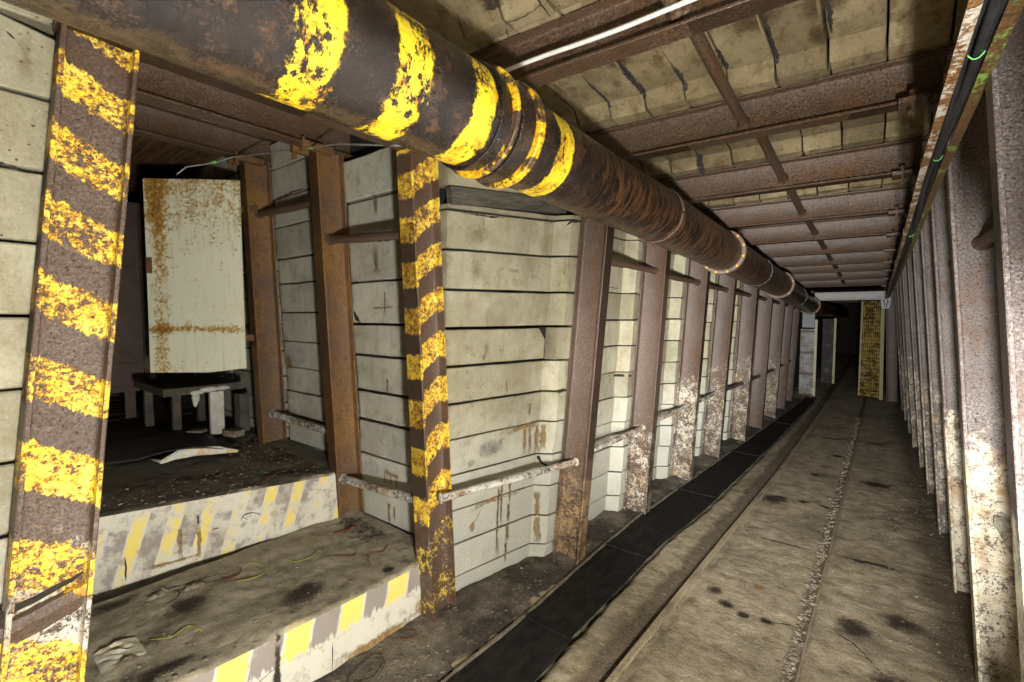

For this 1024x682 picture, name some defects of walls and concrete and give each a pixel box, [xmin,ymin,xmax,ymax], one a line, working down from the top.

rust [511,404,546,449]
rust [477,483,541,560]
water stain [837,617,870,638]
water stain [884,615,921,635]